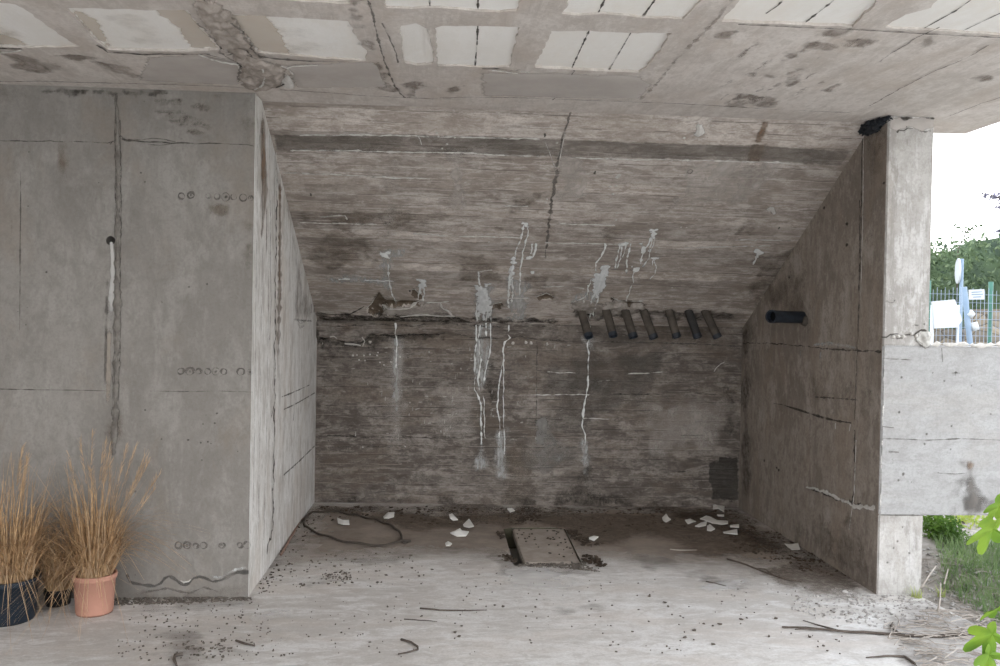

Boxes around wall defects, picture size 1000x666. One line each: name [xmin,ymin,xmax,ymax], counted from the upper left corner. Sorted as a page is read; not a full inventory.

spalling [193,0,294,92]
crack [289,0,592,257]
damp [105,242,115,314]
spalling [316,288,523,341]
damp [321,222,553,476]
crack [319,306,600,421]
damp [575,229,660,327]
crack [600,136,943,530]
damp [554,340,632,506]
damp [964,464,985,512]